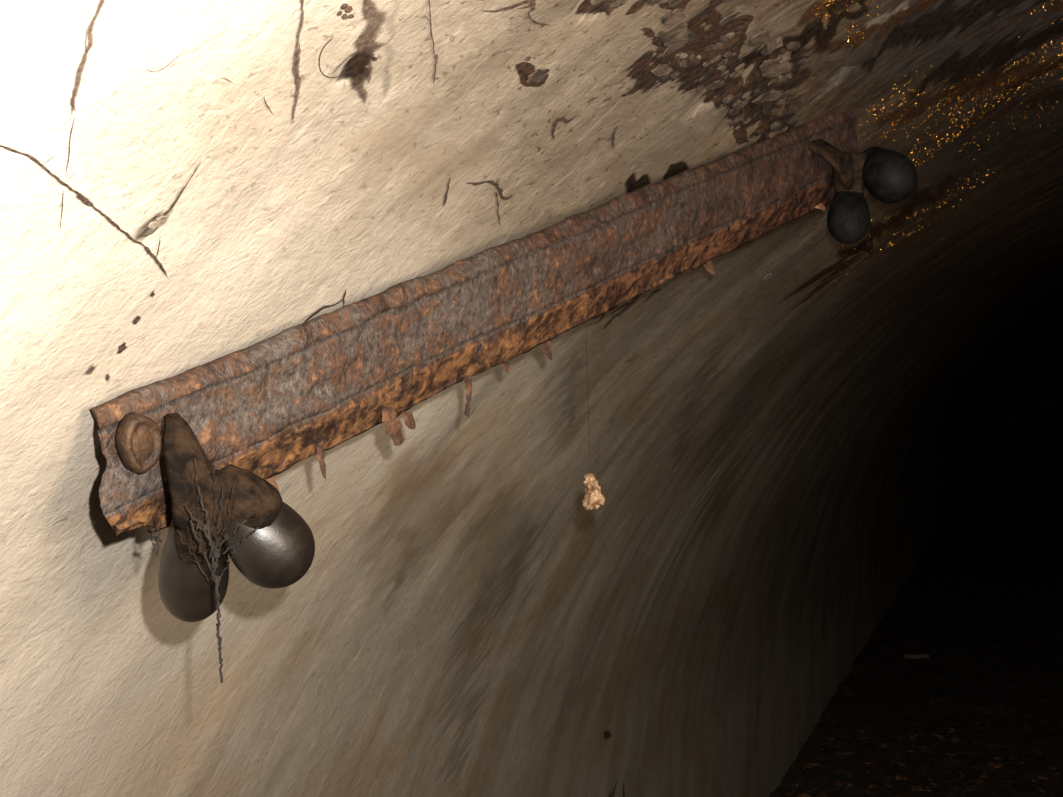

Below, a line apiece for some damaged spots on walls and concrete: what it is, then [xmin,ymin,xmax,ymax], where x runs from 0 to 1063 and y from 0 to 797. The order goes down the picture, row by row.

water stain [338,0,385,102]
spalling [516,56,550,87]
spalling [576,0,815,146]
water stain [741,0,1063,104]
crack [0,119,202,278]
rust [317,446,326,479]
rust [382,407,416,446]